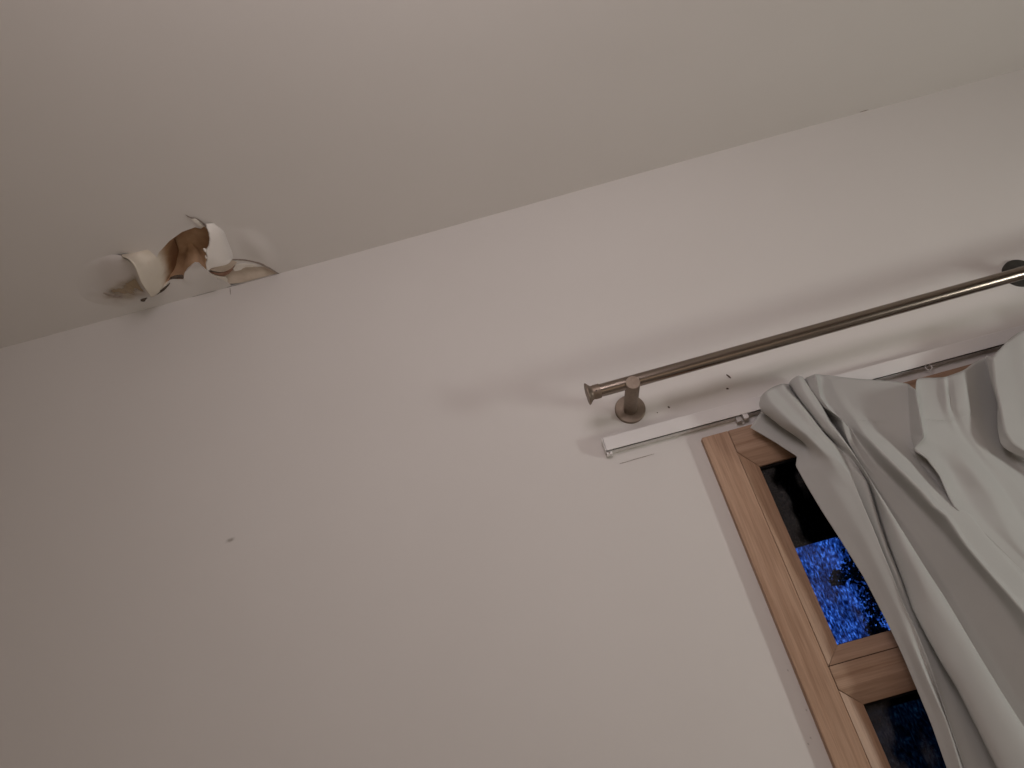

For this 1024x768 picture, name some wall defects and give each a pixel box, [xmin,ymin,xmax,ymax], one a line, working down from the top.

spalling [166,227,277,284]